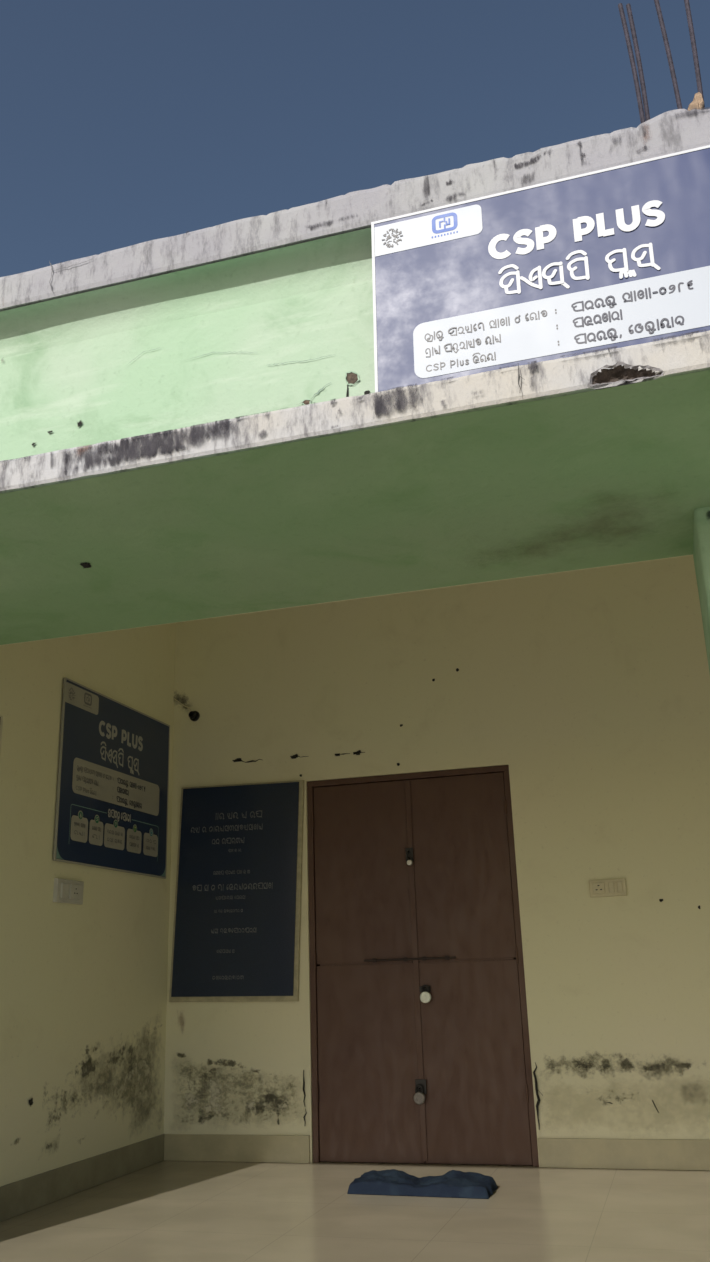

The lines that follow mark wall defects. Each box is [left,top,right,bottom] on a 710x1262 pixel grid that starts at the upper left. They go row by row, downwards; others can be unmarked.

water stain [514,150,550,183]
spalling [589,362,664,386]
water stain [359,384,421,415]
water stain [50,419,239,475]
mould [548,1054,690,1076]